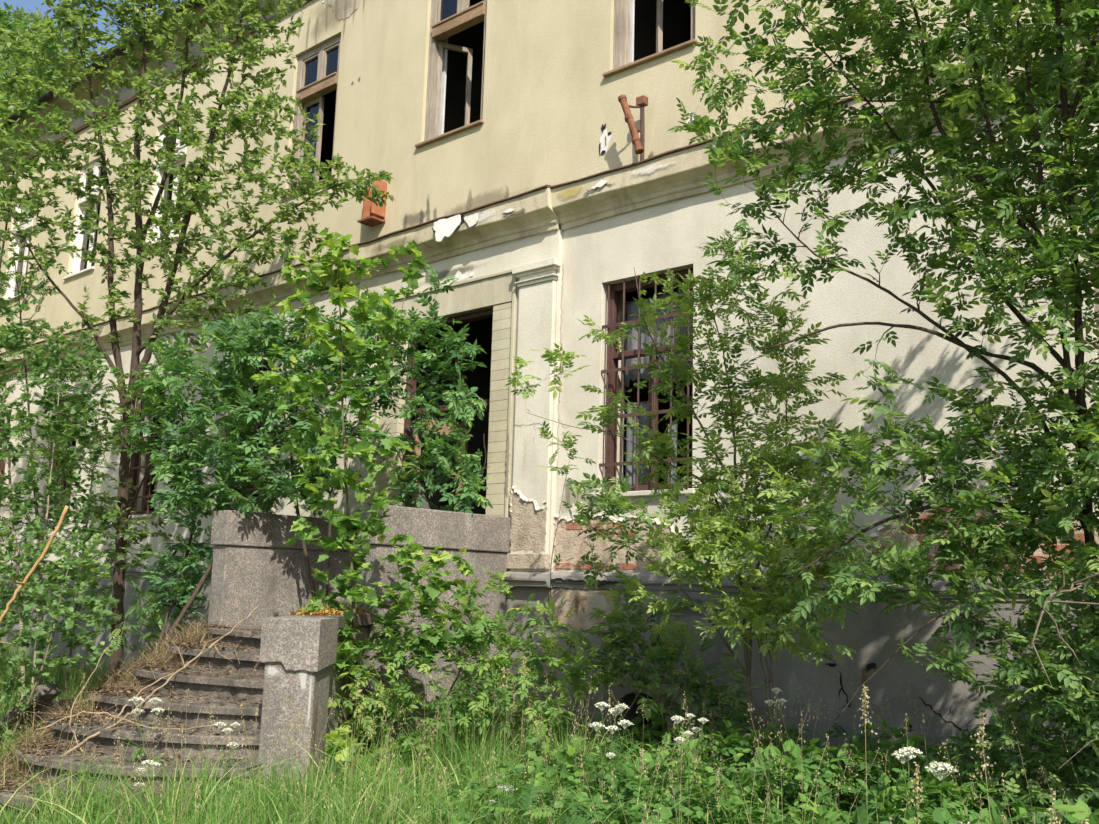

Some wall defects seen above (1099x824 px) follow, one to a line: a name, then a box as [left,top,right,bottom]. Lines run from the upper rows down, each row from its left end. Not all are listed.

spalling [599,123,612,155]
flaking render [432,212,479,242]
flaking render [505,432,697,572]
flaking render [545,588,620,635]
crack [838,672,851,708]
crack [918,697,972,731]